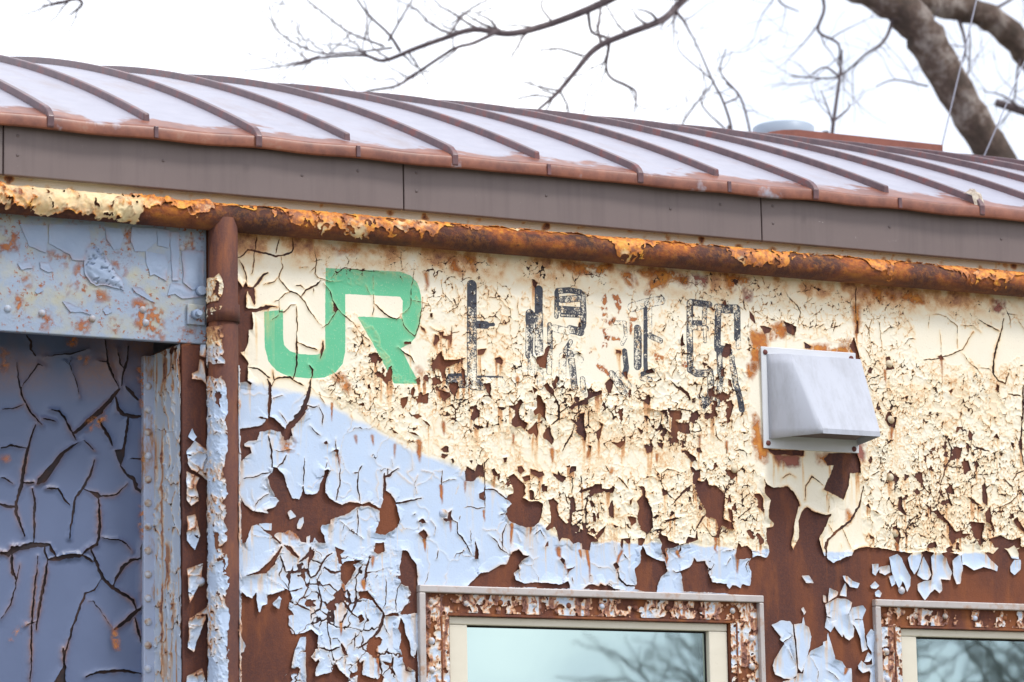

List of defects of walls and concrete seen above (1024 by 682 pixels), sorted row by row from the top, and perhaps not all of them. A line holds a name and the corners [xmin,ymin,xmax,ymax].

rust [0,230,16,251]
rust [562,263,708,293]
rust [726,274,751,301]
rust [747,323,786,378]
peeling [0,181,1024,682]
crack [238,237,1024,682]
rust [752,414,800,467]
crack [0,335,141,680]